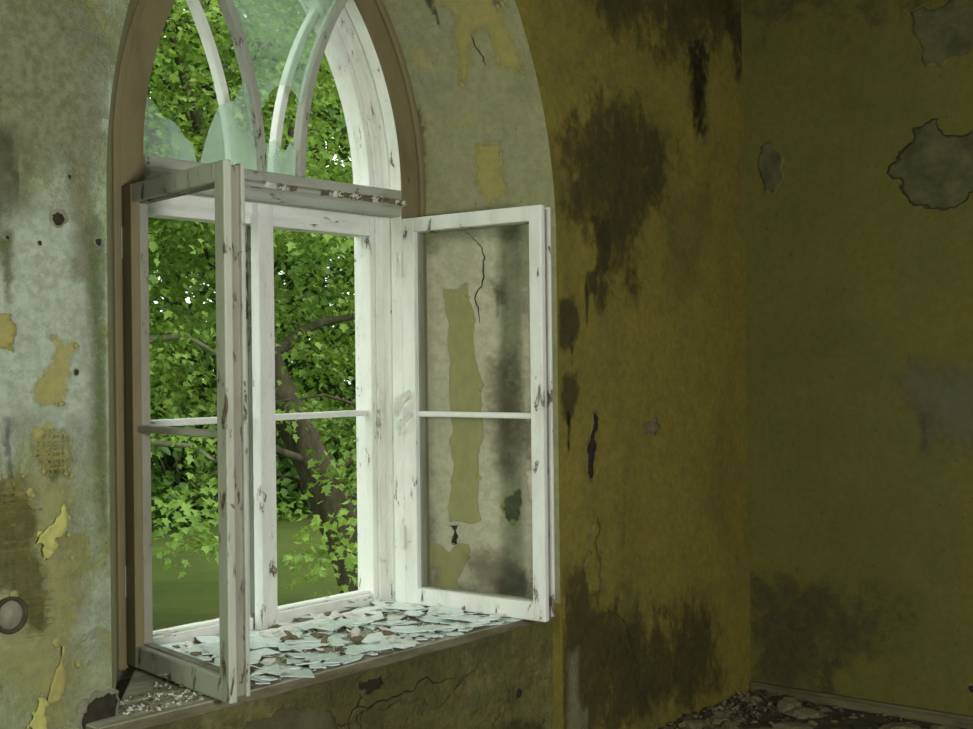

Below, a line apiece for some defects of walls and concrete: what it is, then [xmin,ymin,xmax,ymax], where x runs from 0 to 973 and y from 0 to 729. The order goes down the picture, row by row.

damp [597,0,742,133]
damp [559,91,665,353]
flaking render [0,170,102,729]
crack [337,677,455,729]
damp [563,569,722,729]